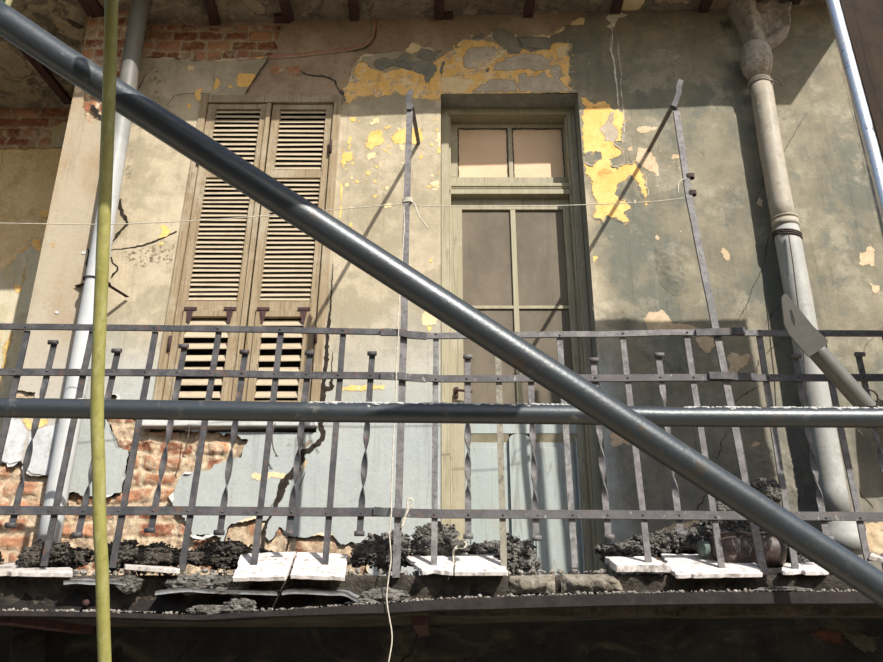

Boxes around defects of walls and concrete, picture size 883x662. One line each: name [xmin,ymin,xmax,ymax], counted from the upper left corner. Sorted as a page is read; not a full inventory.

peeling [339,17,680,224]
water stain [603,13,628,144]
crack [110,199,177,278]
peeling [421,311,438,332]
crack [738,228,771,320]
crack [735,306,780,402]
peeling [858,245,875,266]
crack [262,269,334,551]
flaking render [0,418,58,563]
flaking render [61,493,95,576]
flaking render [109,564,216,575]
flaking render [106,419,248,551]